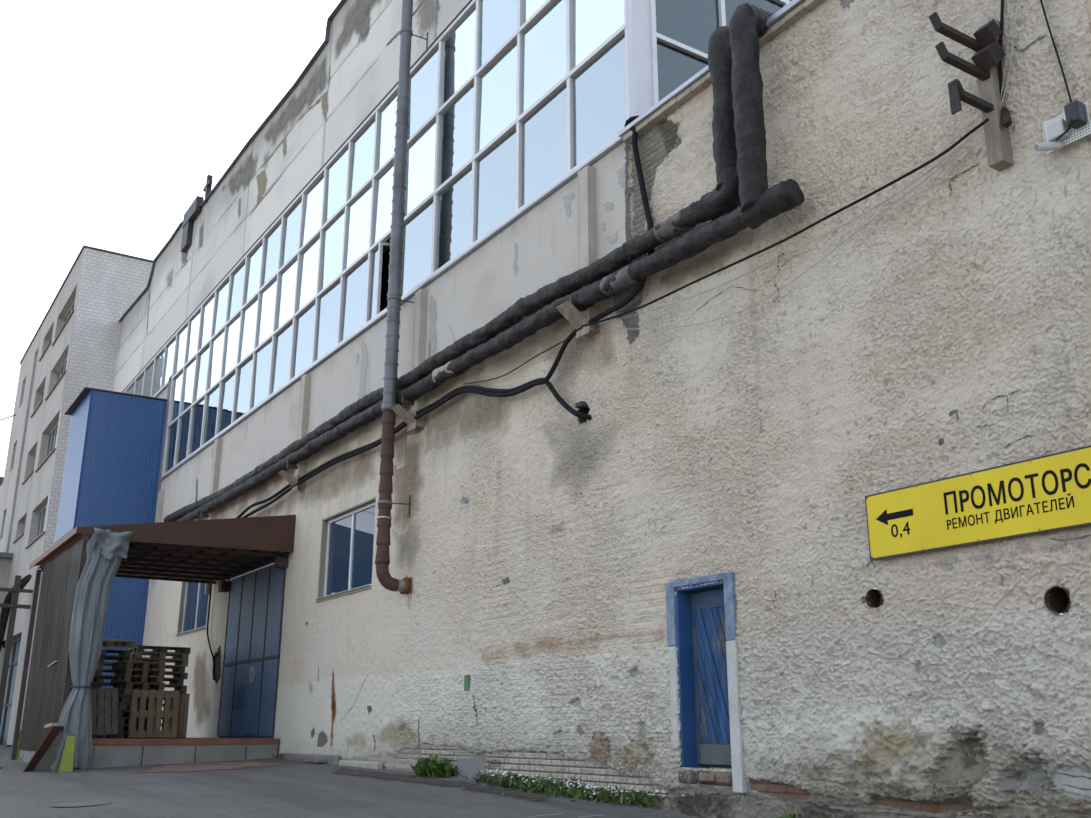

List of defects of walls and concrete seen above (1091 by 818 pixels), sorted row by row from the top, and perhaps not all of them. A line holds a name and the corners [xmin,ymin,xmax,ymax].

water stain [337,0,377,55]
water stain [418,0,435,30]
water stain [266,59,328,156]
water stain [229,157,267,194]
spalling [602,118,682,244]
water stain [168,226,203,285]
spalling [485,727,668,798]
spalling [869,727,993,813]
peeling [1050,766,1091,797]